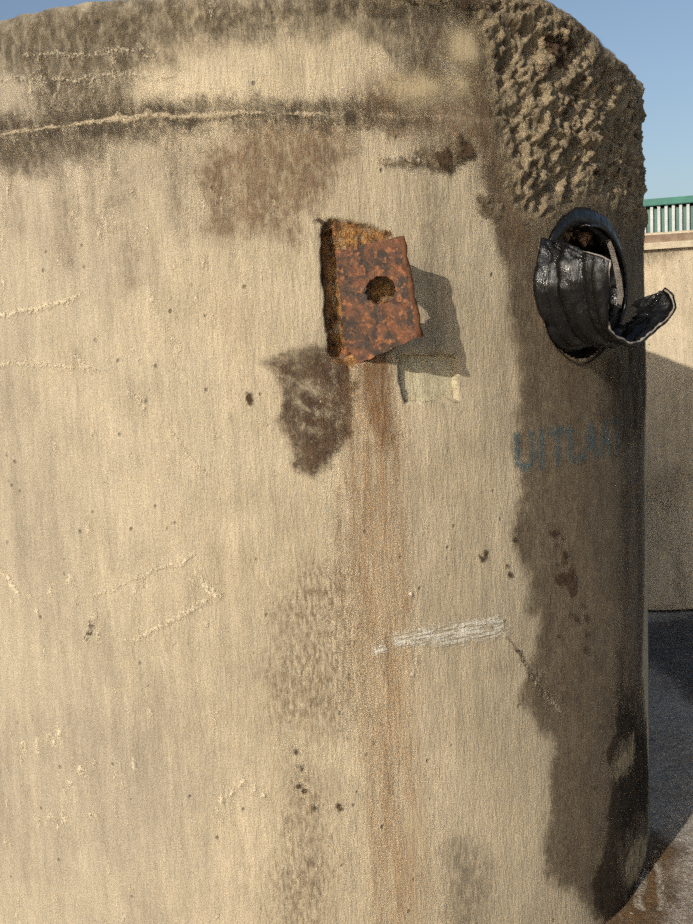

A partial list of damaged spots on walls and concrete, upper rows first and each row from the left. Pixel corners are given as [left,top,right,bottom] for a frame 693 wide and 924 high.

leakage [0,0,480,177]
rust [322,218,396,370]
leakage [195,47,693,924]
crack [503,629,561,712]